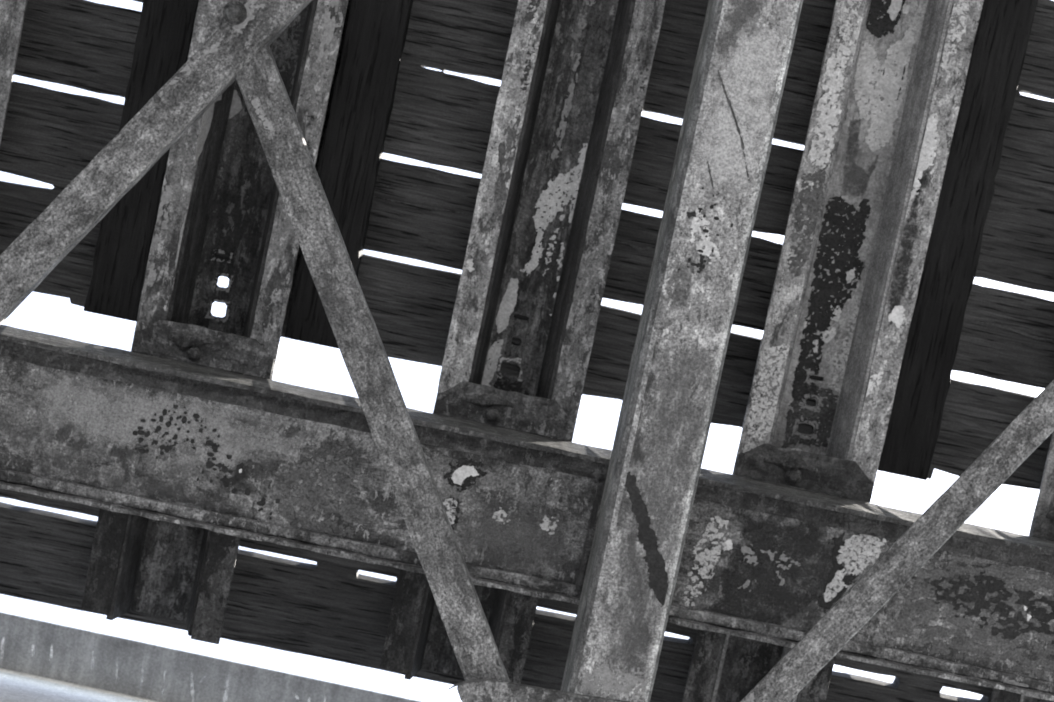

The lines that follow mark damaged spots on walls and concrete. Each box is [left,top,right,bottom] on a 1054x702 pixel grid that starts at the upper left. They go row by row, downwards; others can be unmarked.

peeling [551,53,581,161]
peeling [807,0,915,169]
peeling [482,143,588,387]
peeling [813,303,860,394]
rust [196,385,345,414]
peeling [443,498,457,525]
peeling [451,465,479,485]
rust [617,412,668,672]
peeling [682,516,800,606]
rust [708,514,859,625]
peeling [822,534,887,602]
rust [930,571,1054,644]